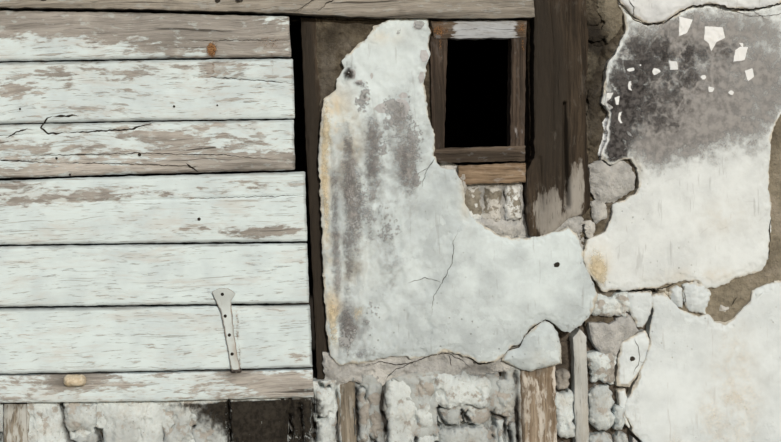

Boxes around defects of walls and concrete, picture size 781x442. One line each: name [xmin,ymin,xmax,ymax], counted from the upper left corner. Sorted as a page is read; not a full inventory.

crack [624,0,781,25]
peeling [679,17,692,36]
peeling [704,26,725,51]
peeling [733,43,748,62]
peeling [652,60,678,75]
flaking render [555,0,637,249]
flaking render [439,163,531,238]
crack [409,240,454,306]
flaking render [583,114,781,442]